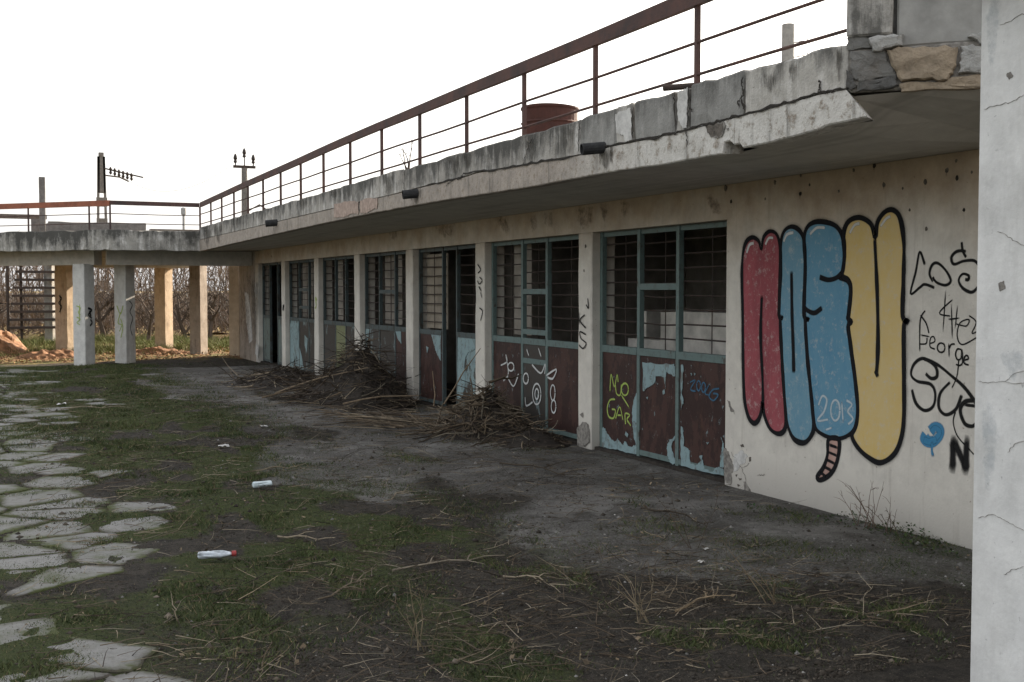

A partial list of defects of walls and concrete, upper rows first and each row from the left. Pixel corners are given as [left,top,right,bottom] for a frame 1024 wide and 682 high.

crack [402,77,843,189]
flaking render [706,121,729,138]
peeling [426,335,441,360]
peeling [457,337,476,399]
peeling [577,362,695,454]
peeling [667,426,751,492]